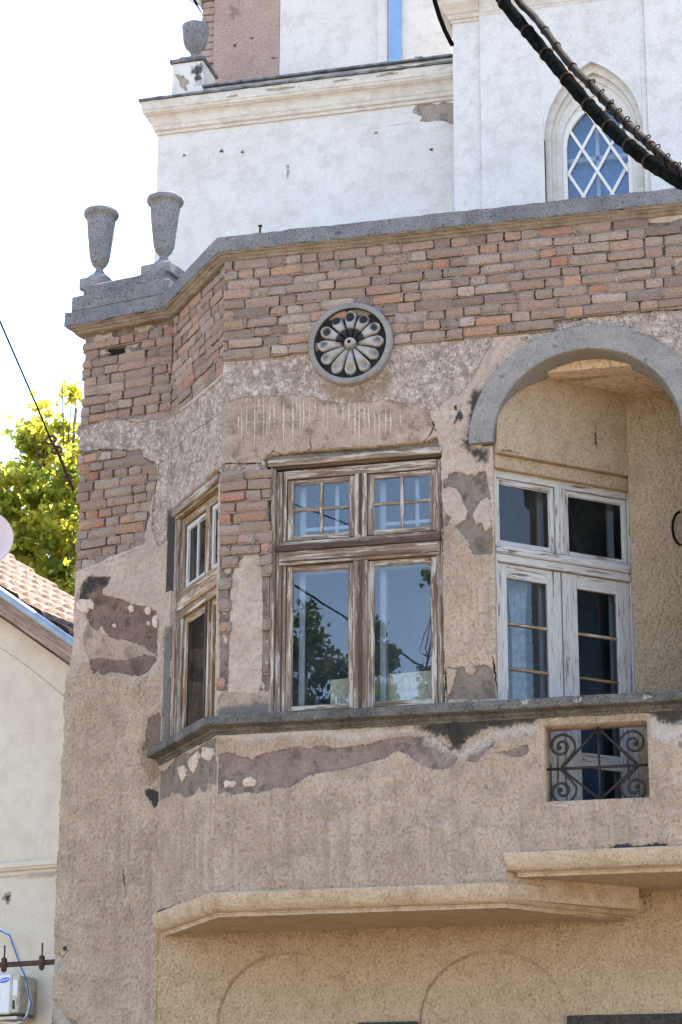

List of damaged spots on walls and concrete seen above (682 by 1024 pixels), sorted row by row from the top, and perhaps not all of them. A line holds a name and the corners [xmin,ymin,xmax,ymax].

peeling [175,74,189,92]
flaking render [413,102,453,124]
flaking render [75,206,682,751]
flaking render [146,735,529,808]